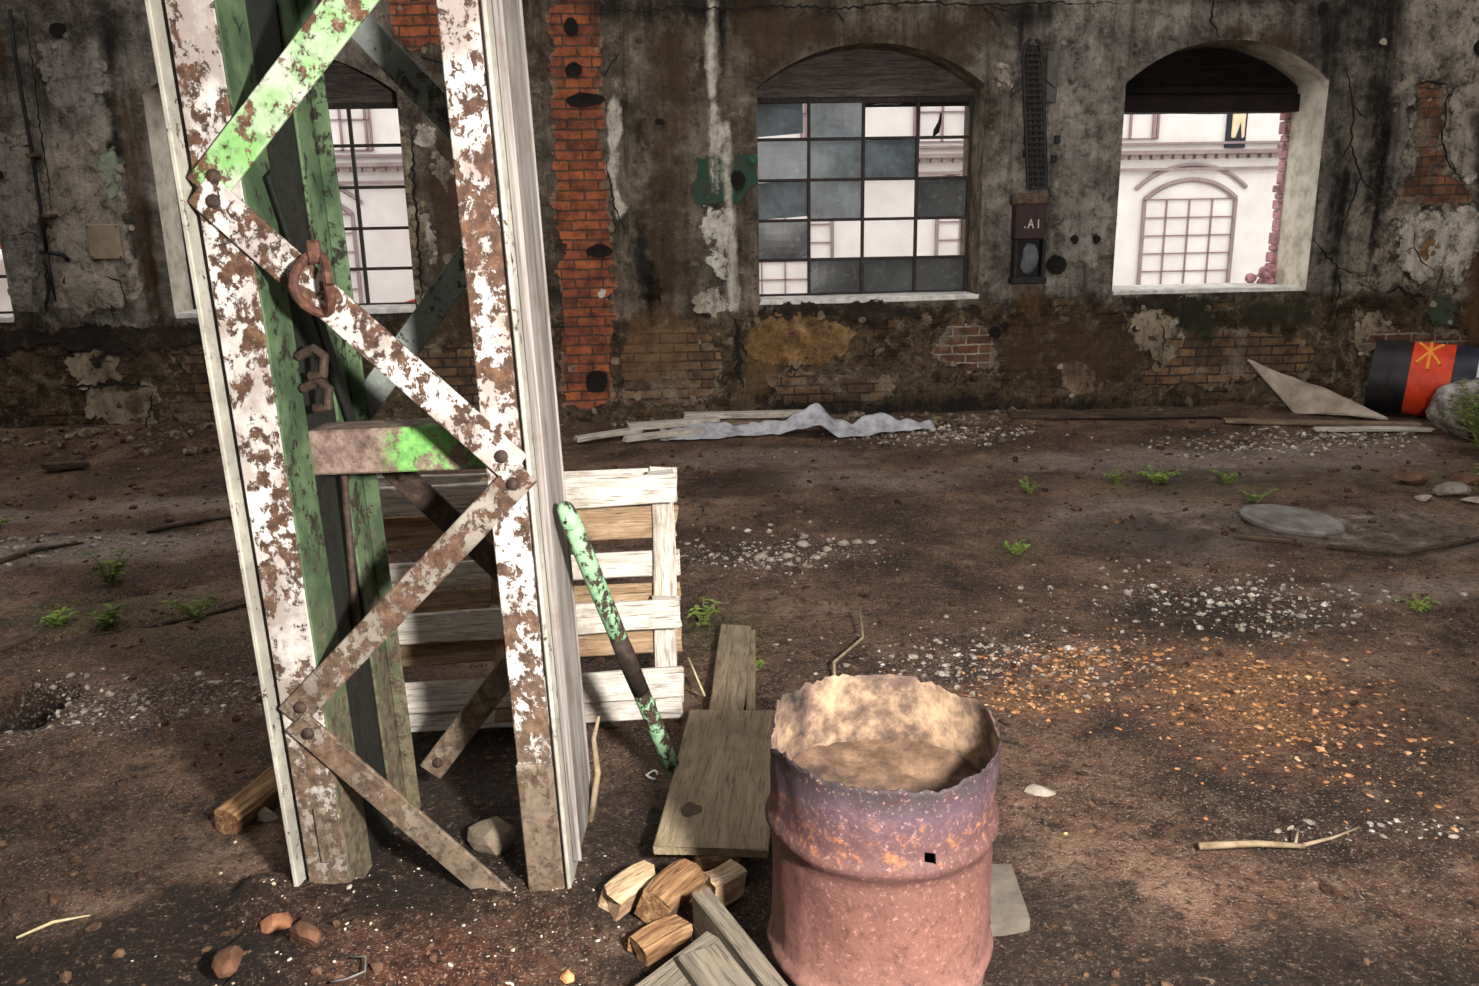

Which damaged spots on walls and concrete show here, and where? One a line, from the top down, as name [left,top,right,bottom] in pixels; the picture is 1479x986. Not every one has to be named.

flaking render [0,31,215,425]
flaking render [744,299,1001,412]
flaking render [1348,0,1479,359]